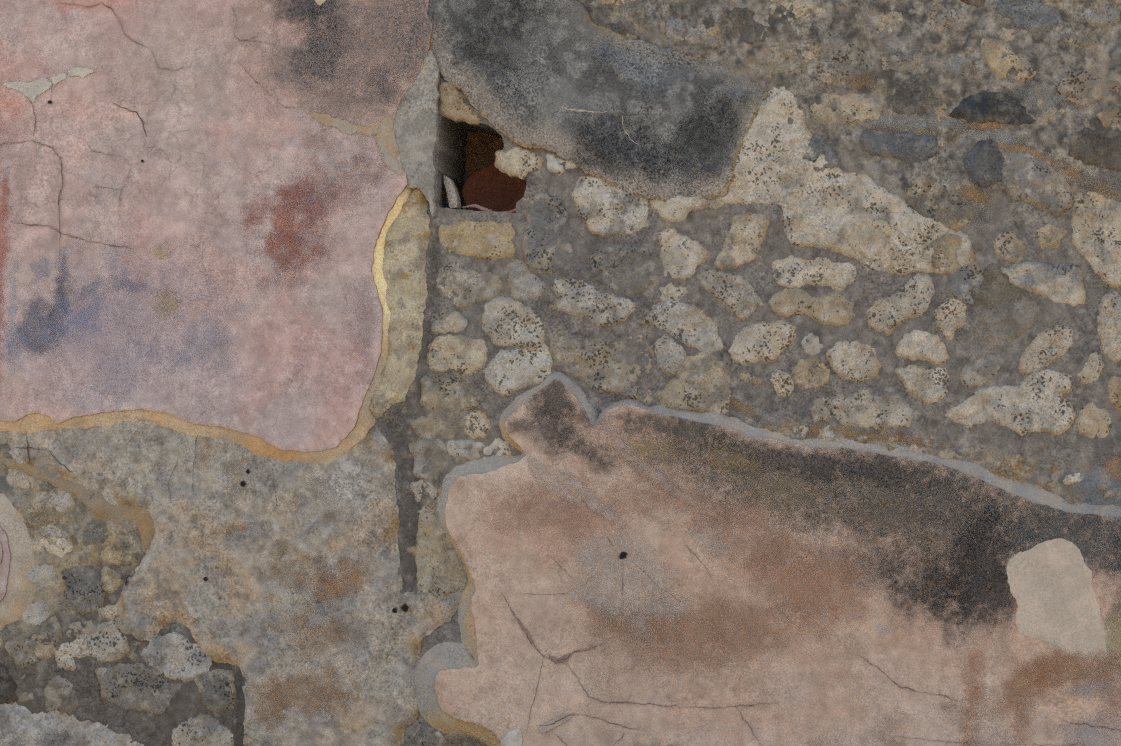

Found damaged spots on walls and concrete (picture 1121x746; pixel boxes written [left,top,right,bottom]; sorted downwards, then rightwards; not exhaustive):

crack [60,2,193,71]
crack [0,98,131,259]
crack [87,102,189,204]
leakage [626,412,1121,636]
crack [500,558,779,746]